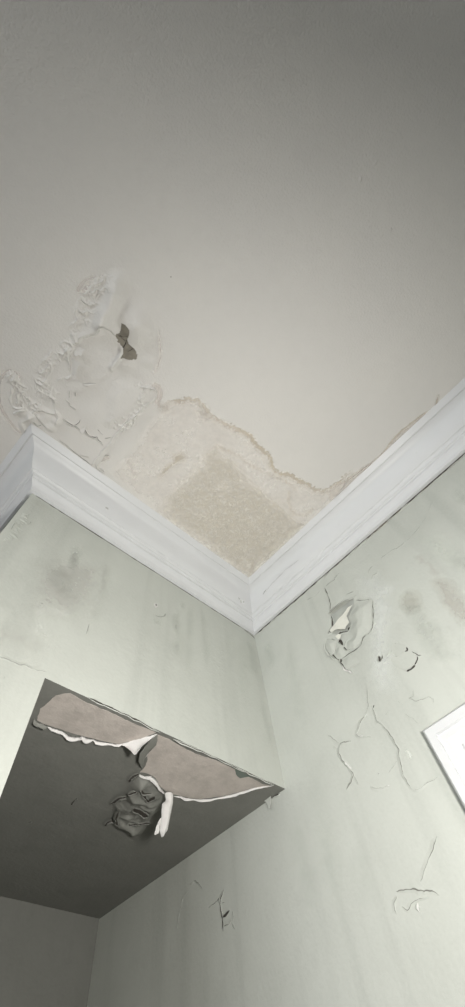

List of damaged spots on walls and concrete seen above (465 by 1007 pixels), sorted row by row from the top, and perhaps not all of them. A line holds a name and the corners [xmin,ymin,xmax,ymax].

leakage [157,452,299,575]
peeling [324,588,374,673]
peeling [377,642,422,673]
peeling [33,693,280,837]
crack [327,688,439,793]
crack [392,834,439,915]